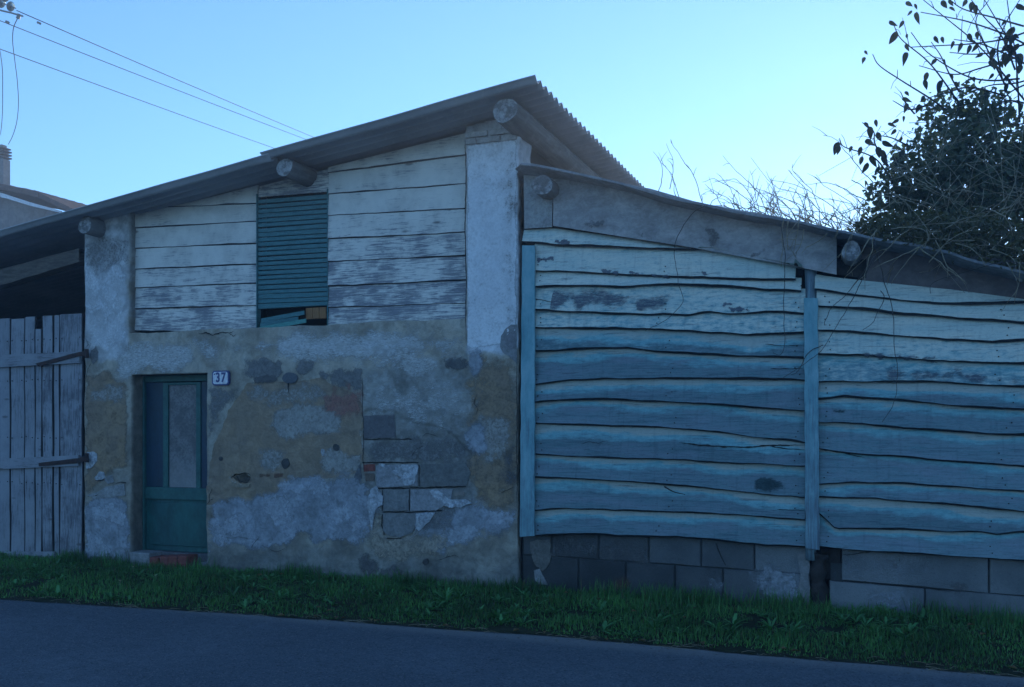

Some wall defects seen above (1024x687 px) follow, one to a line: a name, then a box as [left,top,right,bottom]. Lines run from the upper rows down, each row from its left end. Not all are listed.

peeling [549,286,669,311]
peeling [206,377,419,531]
peeling [415,324,518,531]
spalling [530,539,552,585]